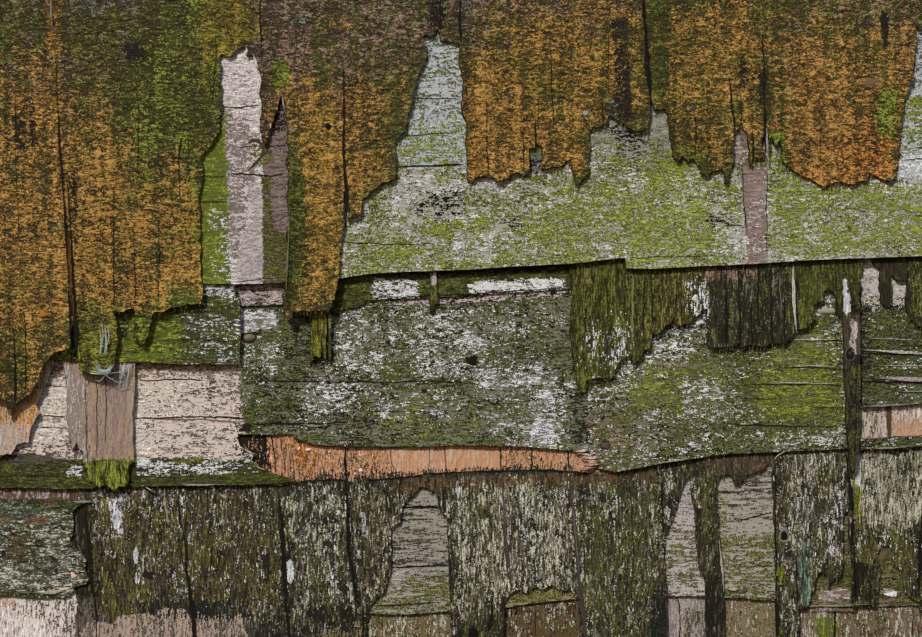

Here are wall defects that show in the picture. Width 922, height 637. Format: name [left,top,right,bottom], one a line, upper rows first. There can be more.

peeling [0,488,85,504]
crack [55,51,79,357]
peeling [312,487,451,637]
leakage [183,0,658,266]
peeling [0,28,922,486]
leakage [0,165,922,637]